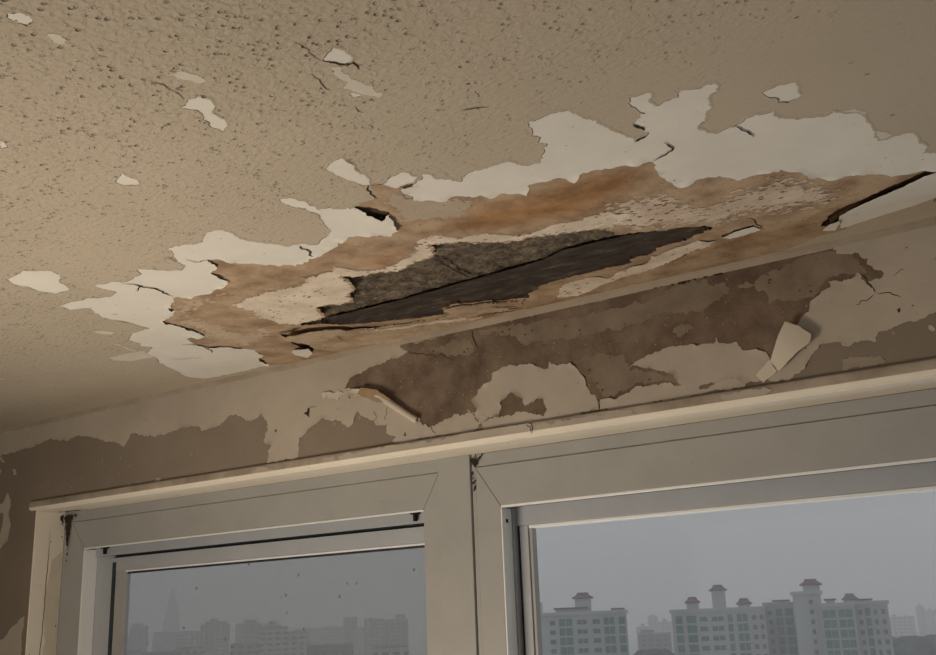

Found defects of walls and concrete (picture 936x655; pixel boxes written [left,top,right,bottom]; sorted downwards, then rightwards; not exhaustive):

peeling [173,71,230,133]
peeling [320,46,382,99]
peeling [0,81,936,473]
damp [346,249,883,427]
peeling [0,493,11,548]
peeling [0,616,24,655]